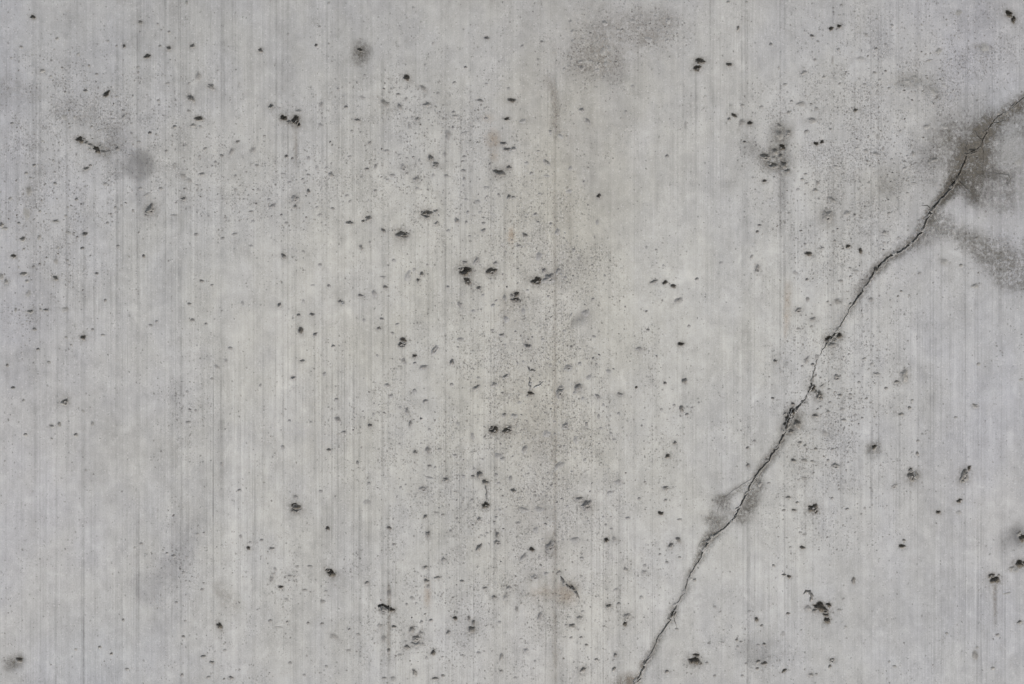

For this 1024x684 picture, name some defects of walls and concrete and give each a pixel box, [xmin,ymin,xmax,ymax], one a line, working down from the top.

crack [633,97,1024,684]